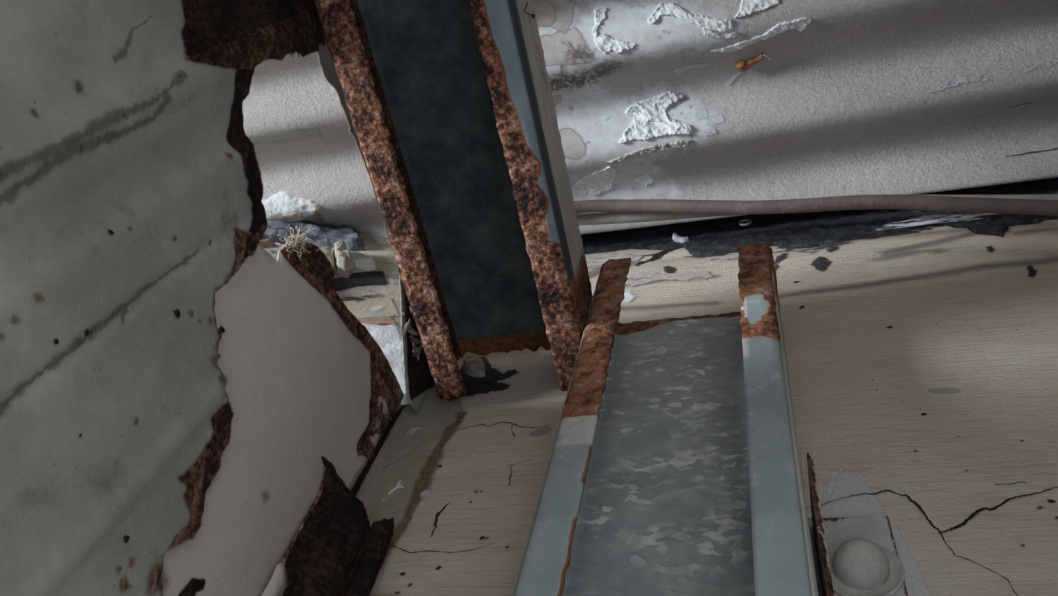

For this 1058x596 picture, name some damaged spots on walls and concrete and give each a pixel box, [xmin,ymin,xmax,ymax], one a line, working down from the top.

peeling [592,6,636,54]
peeling [647,0,812,53]
rust [181,0,326,282]
peeling [570,91,692,197]
water stain [533,0,742,201]
rust [281,239,435,461]
crack [807,481,1058,596]